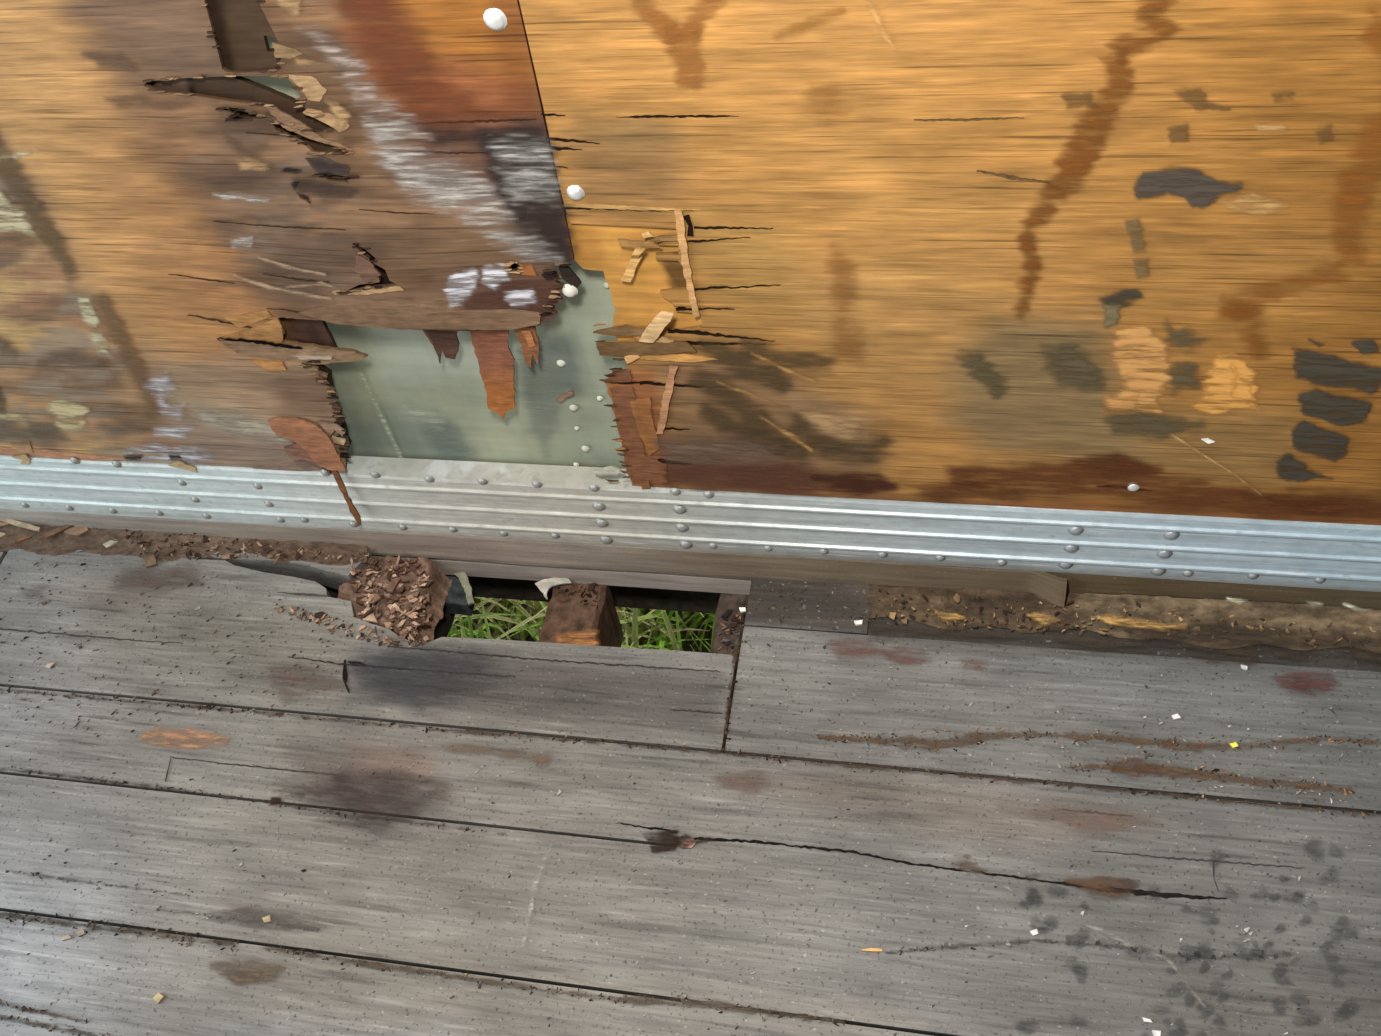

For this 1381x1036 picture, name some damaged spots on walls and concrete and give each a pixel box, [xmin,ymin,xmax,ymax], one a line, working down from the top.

peeling [265,42,357,174]
leakage [1017,0,1176,312]
peeling [564,202,701,211]
peeling [618,231,678,248]
peeling [332,251,404,295]
peeling [519,263,582,288]
peeling [250,354,333,371]
peeling [607,336,718,383]
peeling [317,420,346,446]
peeling [253,443,324,471]
crack [922,770,1267,817]
crack [615,822,1303,899]